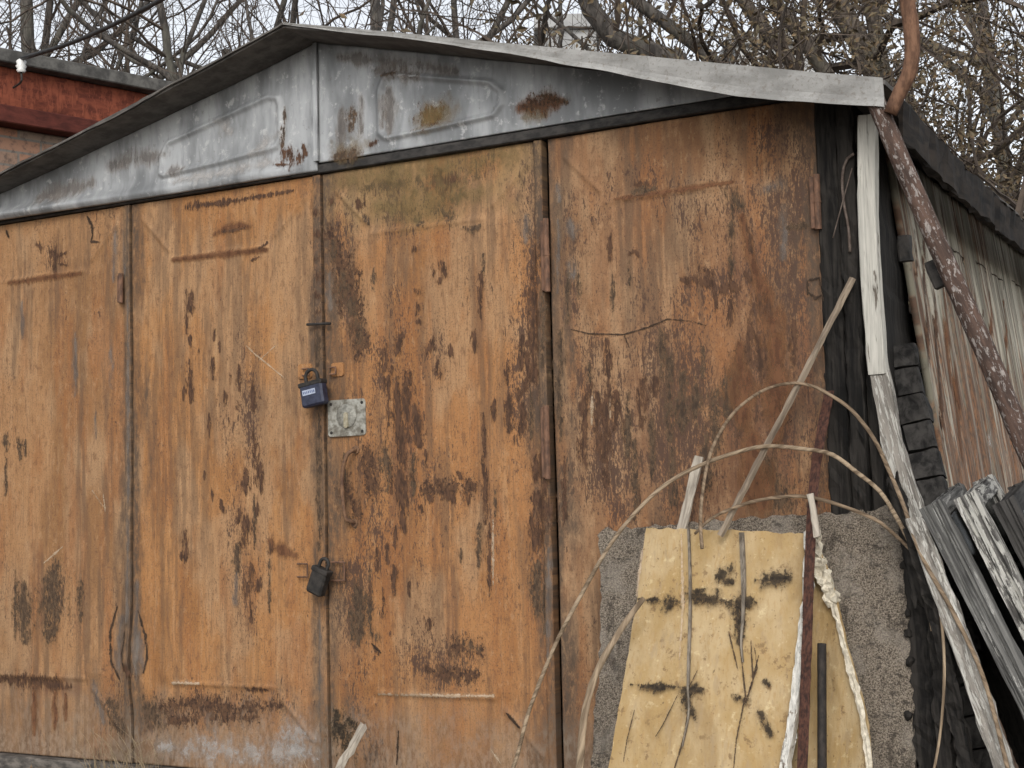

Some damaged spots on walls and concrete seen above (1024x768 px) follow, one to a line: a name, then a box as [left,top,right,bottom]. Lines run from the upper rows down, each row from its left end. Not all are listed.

rust [275,109,308,171]
rust [517,91,569,117]
rust [172,241,268,262]
rust [185,189,294,211]
rust [182,288,221,404]
crack [571,318,706,348]
rust [524,203,798,555]
rust [914,229,963,460]
rust [232,431,297,623]
rust [374,332,428,618]
rust [476,364,528,599]
rust [0,672,72,736]